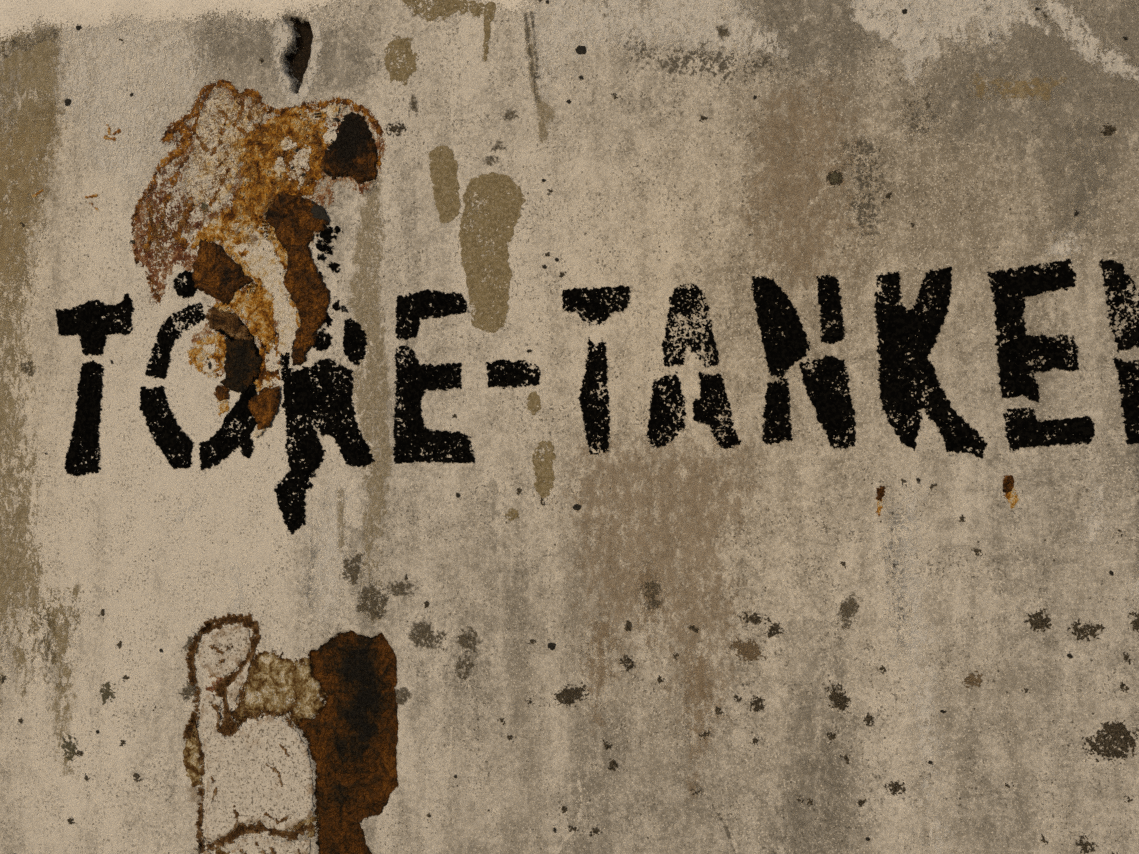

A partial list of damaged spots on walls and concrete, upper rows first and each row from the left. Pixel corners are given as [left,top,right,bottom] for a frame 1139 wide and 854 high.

leakage [384,36,417,85]
leakage [402,0,496,61]
corrosion [130,78,387,438]
leakage [429,146,526,333]
leakage [0,15,217,774]